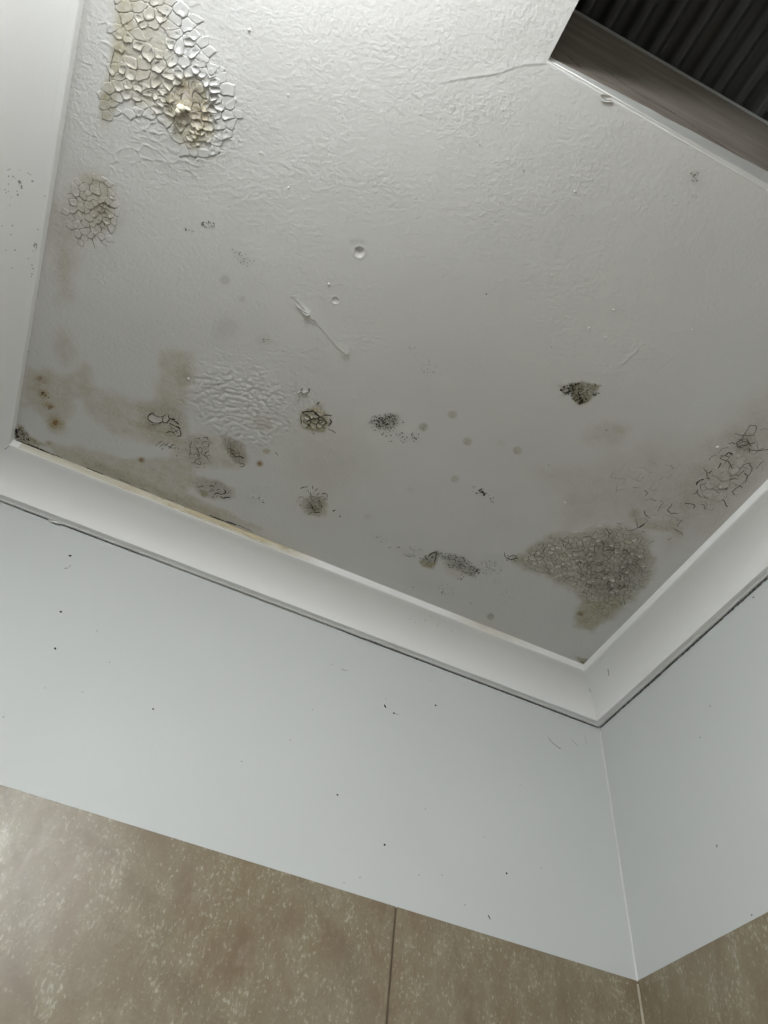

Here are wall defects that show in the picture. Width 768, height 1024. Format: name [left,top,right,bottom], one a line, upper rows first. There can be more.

peeling [66,0,277,208]
water stain [14,154,430,543]
crack [147,413,245,499]
water stain [376,376,768,636]
crack [504,425,768,616]